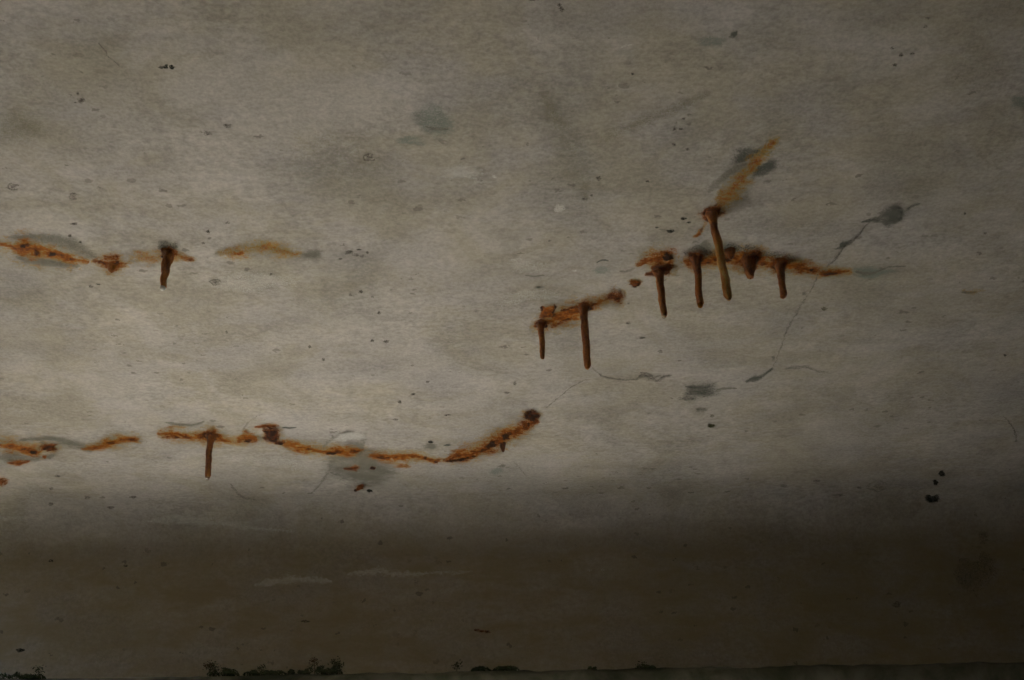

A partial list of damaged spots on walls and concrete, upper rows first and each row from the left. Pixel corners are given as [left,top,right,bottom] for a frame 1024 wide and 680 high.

corrosion [0,228,196,280]
corrosion [215,237,322,262]
corrosion [530,136,853,339]
crack [768,223,869,373]
corrosion [0,409,541,472]